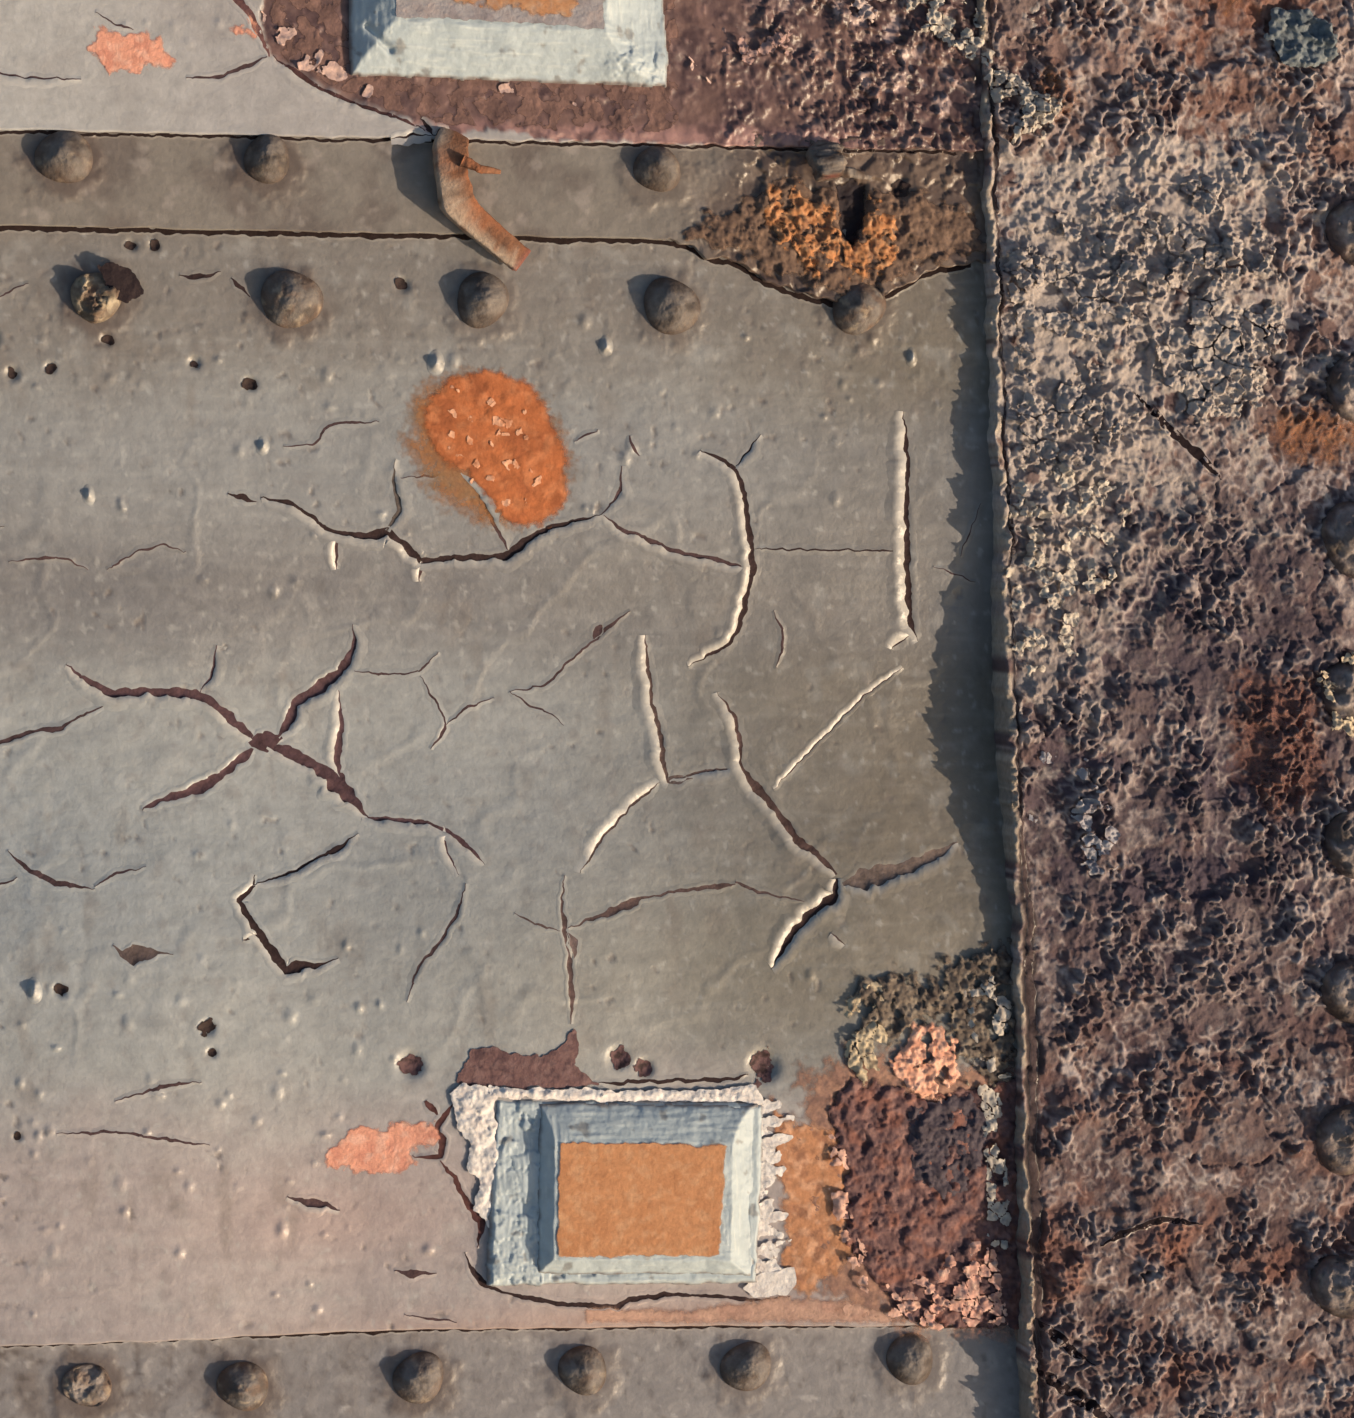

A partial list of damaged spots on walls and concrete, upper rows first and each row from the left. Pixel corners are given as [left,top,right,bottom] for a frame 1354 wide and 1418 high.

crack [0,66,106,89]
peeling [87,26,176,74]
crack [186,0,273,84]
crack [0,115,808,156]
rust [407,369,568,524]
rust [1272,408,1354,462]
crack [0,410,983,1024]
rust [1234,671,1331,820]
spalling [397,1054,423,1075]
peeling [326,1121,440,1174]
peeling [450,1029,774,1228]
rust [586,1048,1022,1342]